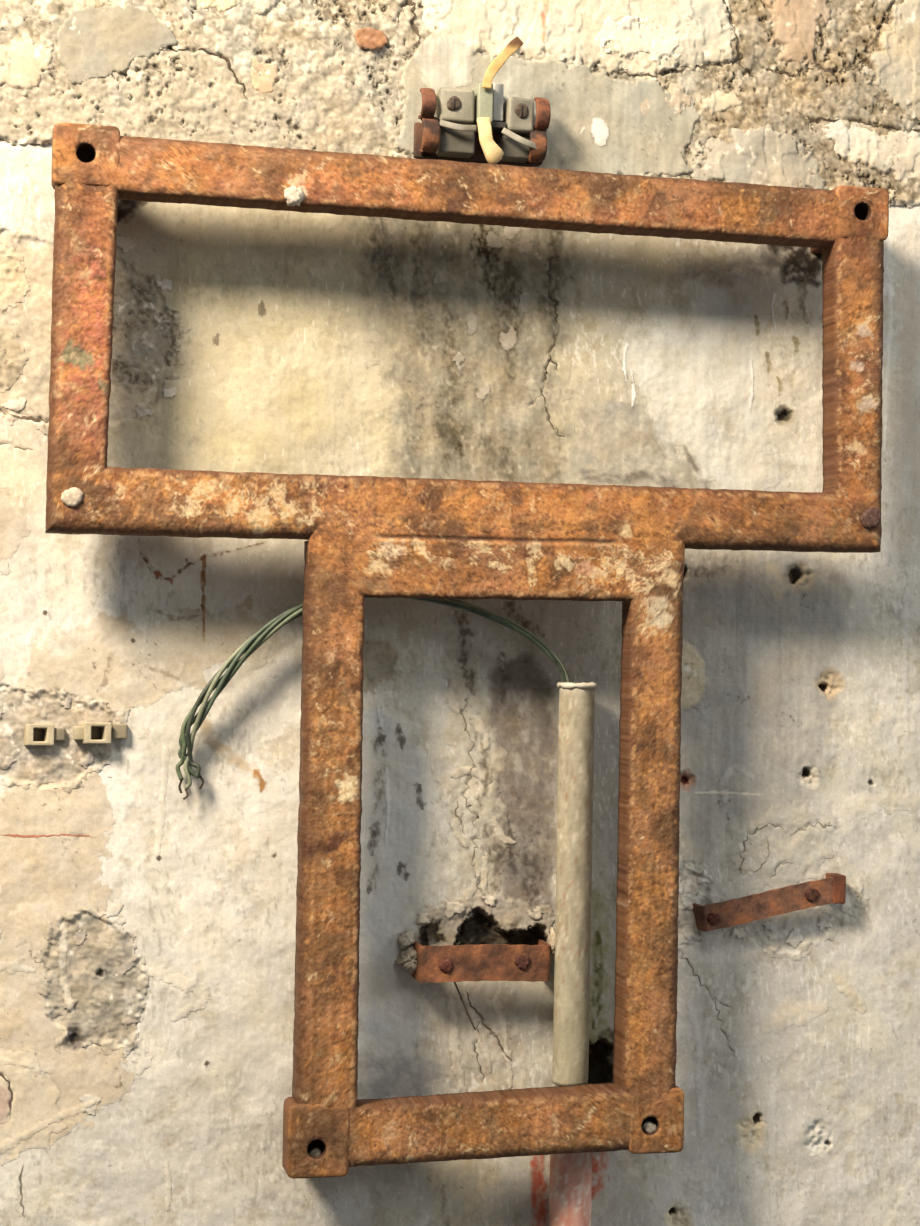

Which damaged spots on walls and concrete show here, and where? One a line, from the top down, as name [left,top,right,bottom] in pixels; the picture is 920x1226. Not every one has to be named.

flaking render [0,0,920,208]
peeling [0,484,31,575]
crack [0,410,49,450]
corrosion [137,538,267,642]
damp [342,215,711,489]
crack [527,253,562,436]
peeling [0,595,288,1165]
corrosion [196,718,267,793]
peeling [358,635,555,1057]
crack [454,657,492,905]
damp [484,650,561,911]
crack [465,990,512,1082]